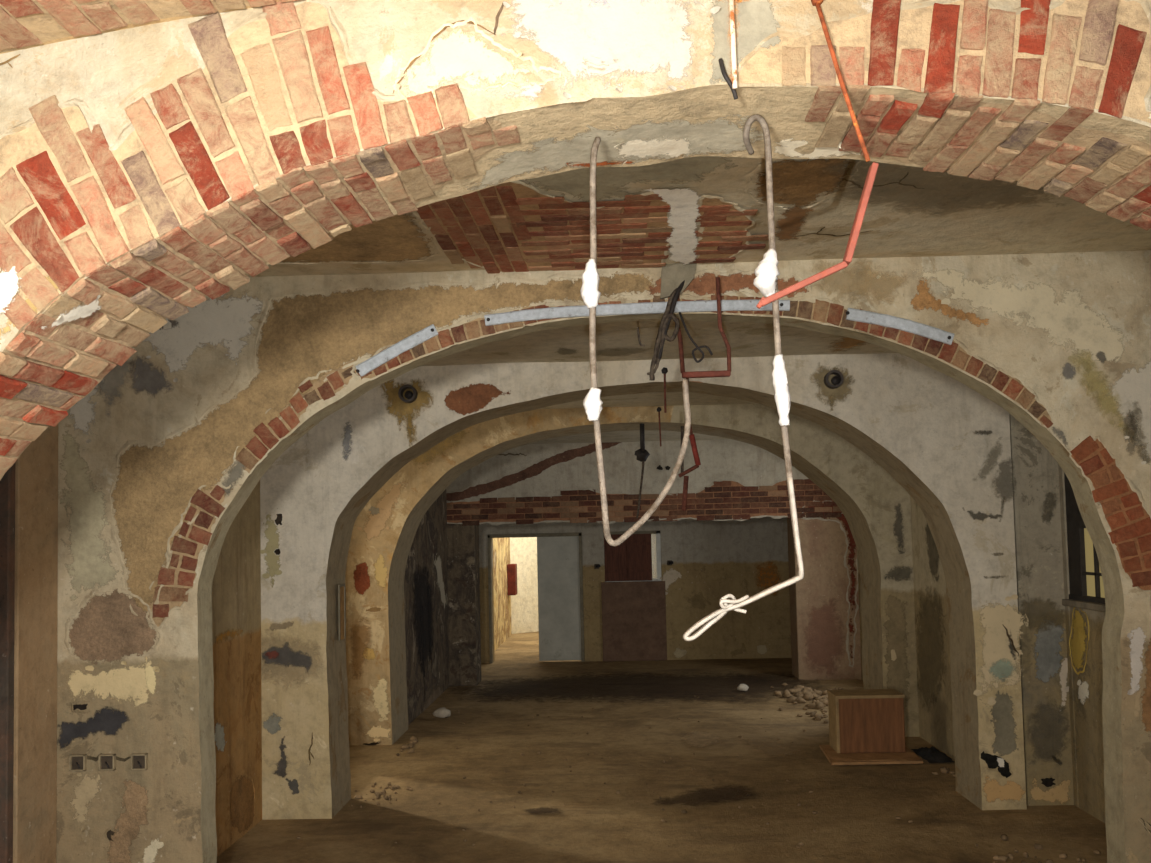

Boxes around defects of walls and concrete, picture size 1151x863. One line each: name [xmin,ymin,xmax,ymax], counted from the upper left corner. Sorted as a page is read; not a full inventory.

water stain [832,161,1043,214]
flaking render [0,0,702,713]
flaking render [660,272,1054,428]
peeling [875,268,1151,464]
water stain [413,565,434,695]
flaking render [446,442,859,667]
peeling [973,594,1029,707]
peeling [1059,607,1090,711]
flaking render [1069,435,1151,736]